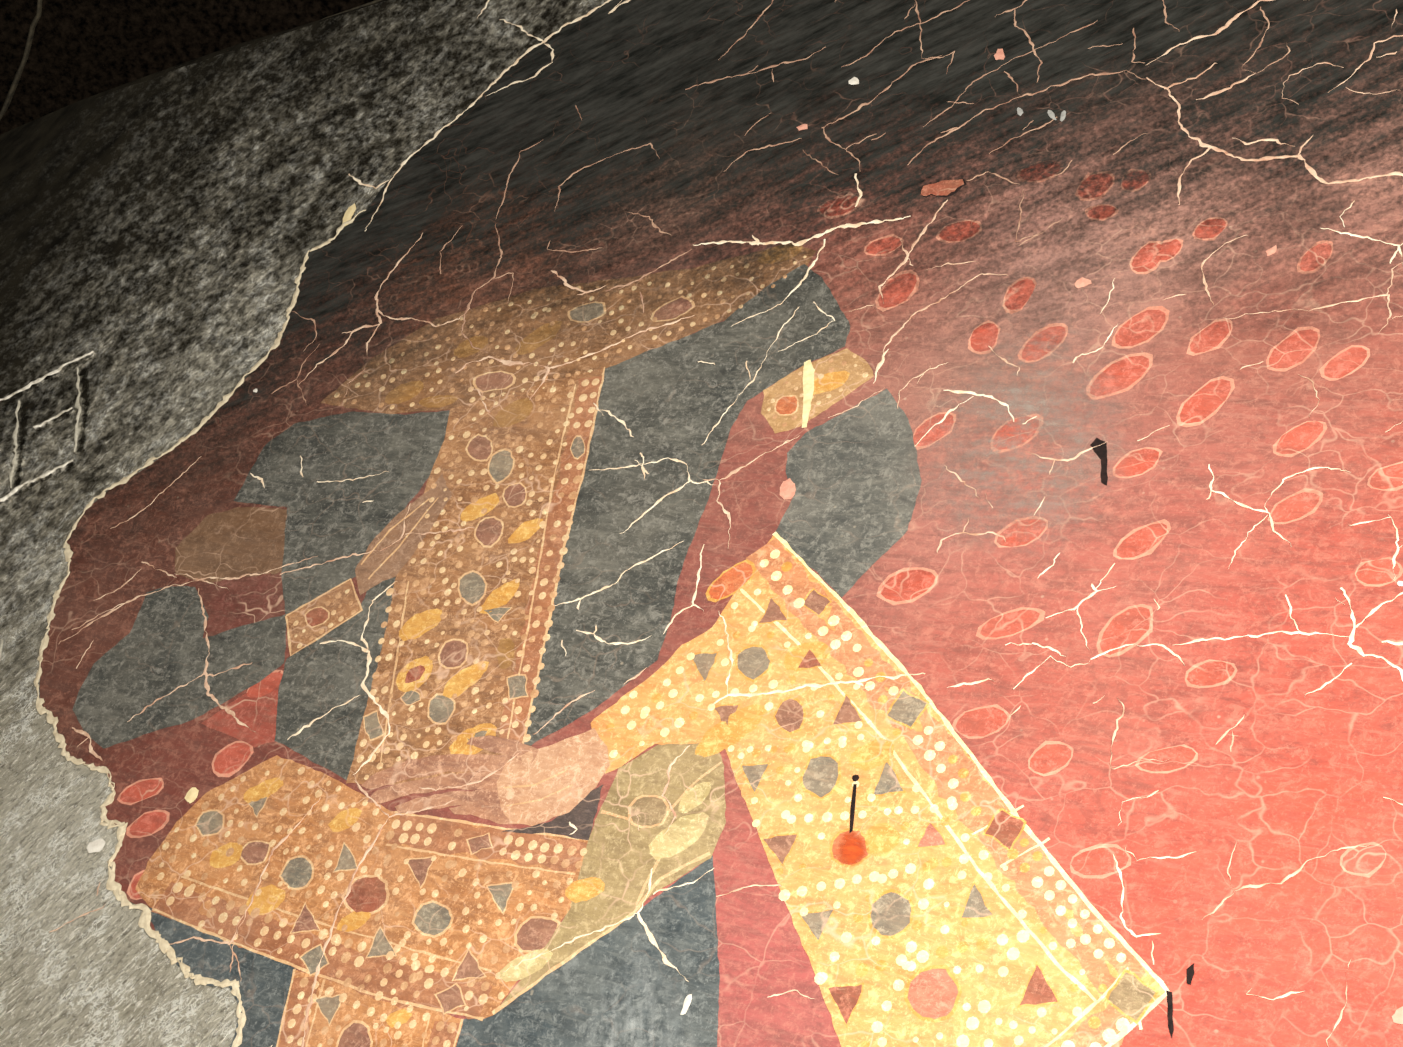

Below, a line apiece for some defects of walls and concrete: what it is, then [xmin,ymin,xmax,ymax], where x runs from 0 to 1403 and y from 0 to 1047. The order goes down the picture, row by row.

peeling [920,178,966,198]
crack [271,0,1403,718]
flaking render [0,0,612,1047]
peeling [780,478,796,500]
spalling [1091,438,1108,485]
crack [59,504,475,732]
crack [271,581,595,1047]
crack [503,868,782,982]
crack [1093,695,1196,965]
crack [1202,841,1371,920]
peeling [680,994,692,1015]
spalling [1166,990,1174,1037]